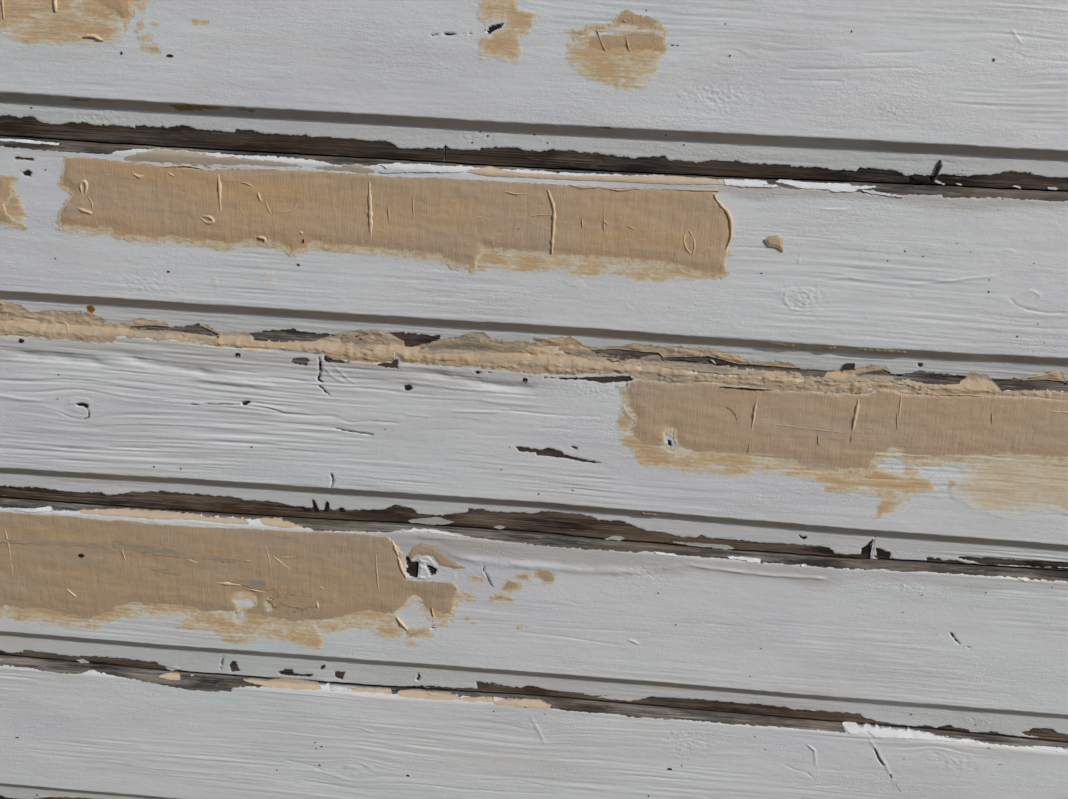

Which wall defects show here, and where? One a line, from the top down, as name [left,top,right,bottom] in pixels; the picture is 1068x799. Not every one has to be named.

peeling [0,107,1068,211]
peeling [130,323,220,338]
peeling [249,328,335,342]
peeling [389,332,441,350]
spalling [291,357,309,366]
peeling [592,349,827,378]
peeling [844,363,967,385]
peeling [991,377,1068,392]
peeling [0,485,1068,588]
peeling [0,650,266,692]
peeling [279,665,353,691]
peeling [391,681,1068,752]